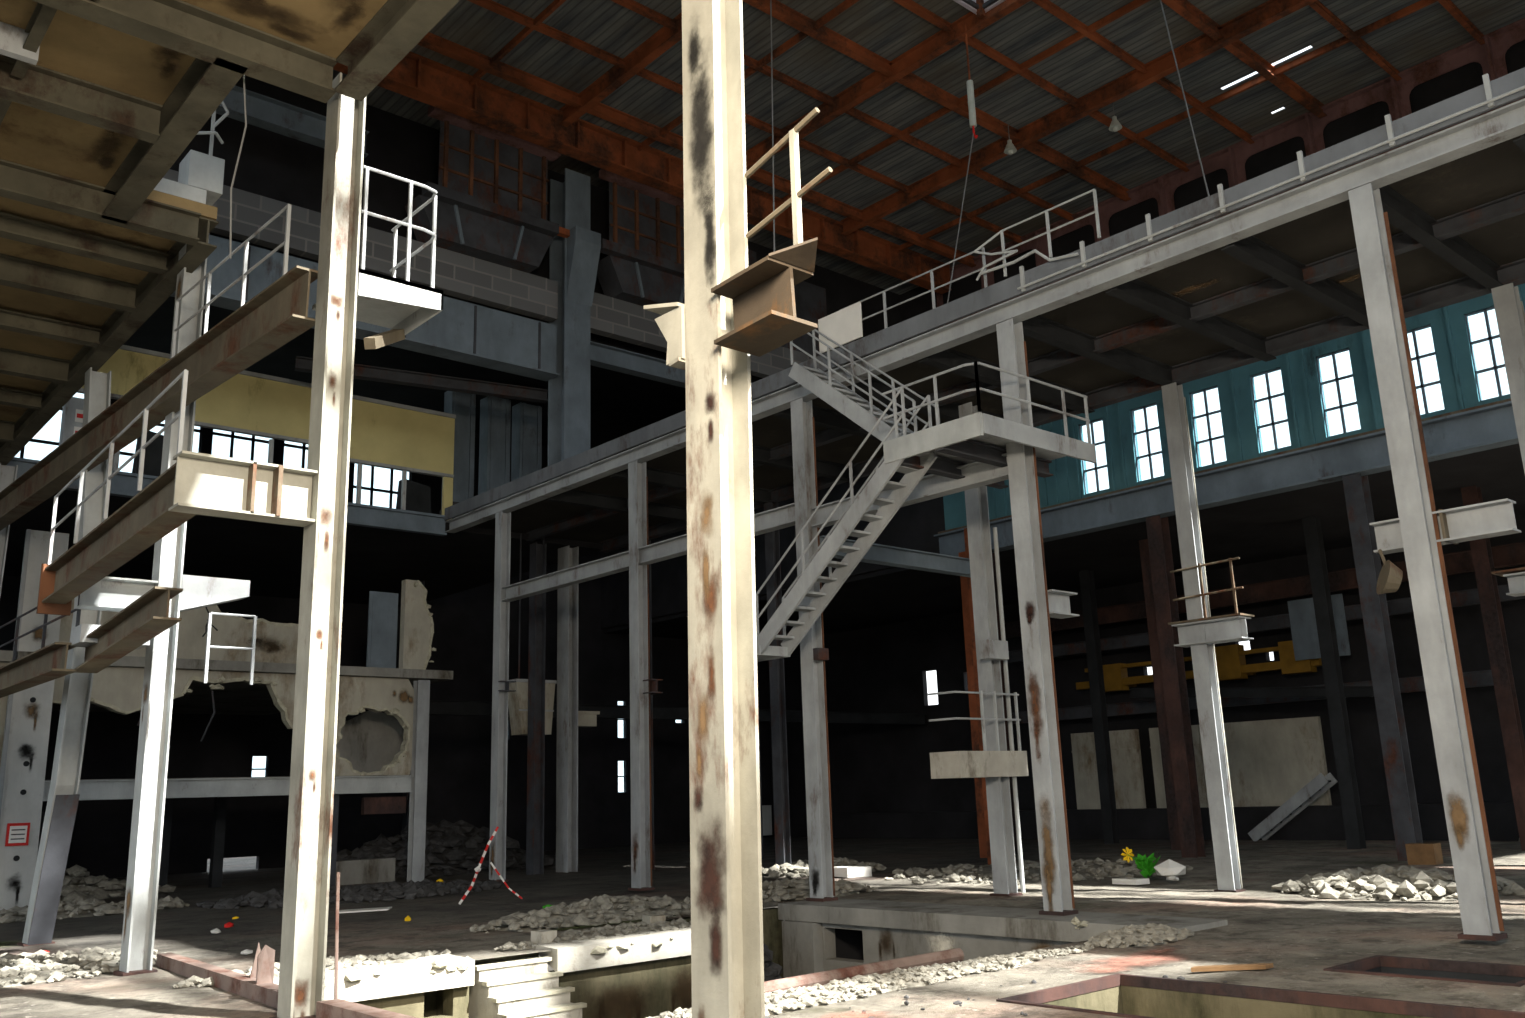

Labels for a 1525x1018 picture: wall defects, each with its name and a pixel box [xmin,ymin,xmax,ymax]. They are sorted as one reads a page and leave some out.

leakage [229,0,306,40]
corrosion [702,498,712,528]
corrosion [703,553,716,617]
corrosion [1383,212,1505,931]
spalling [336,705,411,776]
corrosion [695,657,715,809]
corrosion [1026,447,1075,911]
corrosion [698,826,723,969]